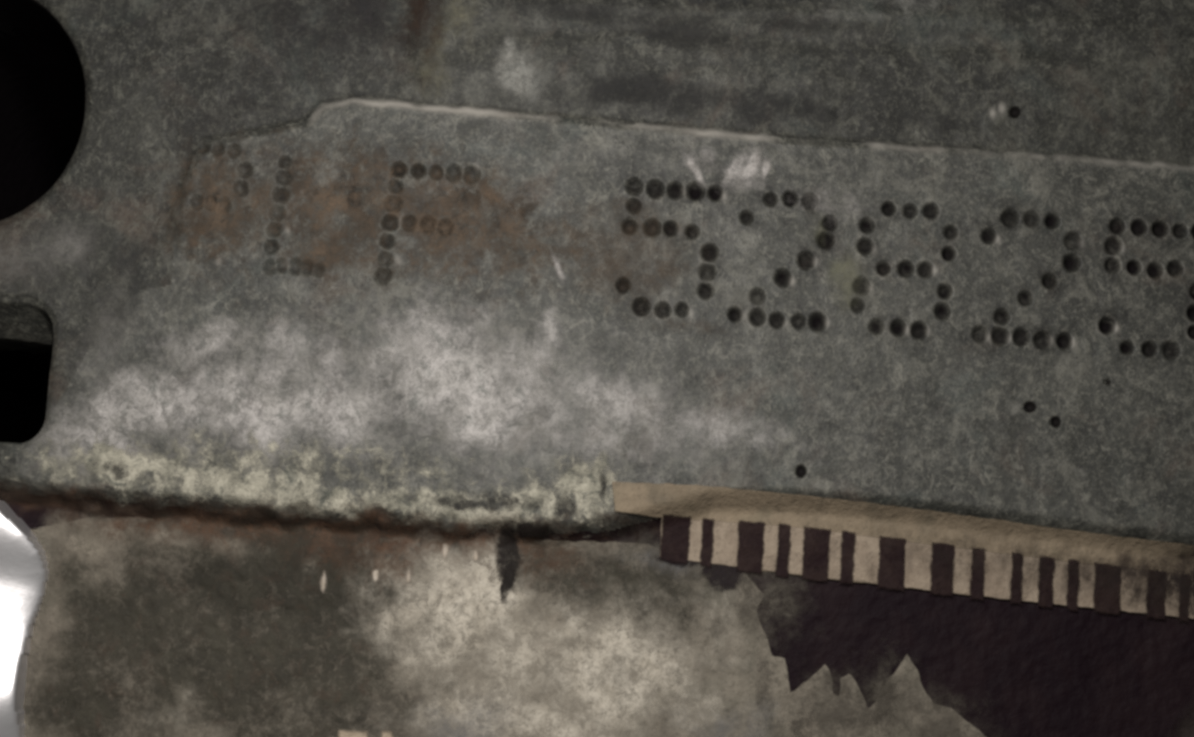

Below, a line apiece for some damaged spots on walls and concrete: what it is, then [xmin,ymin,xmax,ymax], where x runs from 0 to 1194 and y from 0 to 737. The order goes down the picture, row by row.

leakage [55,319,650,453]